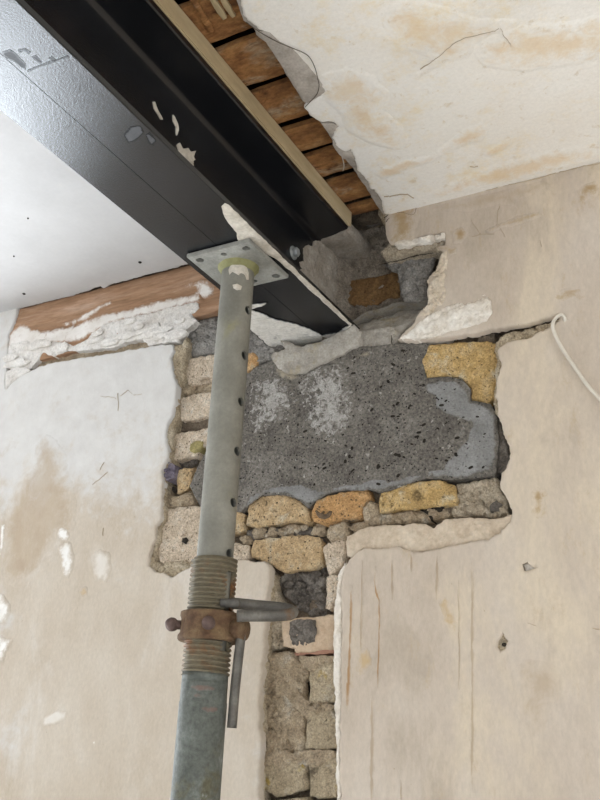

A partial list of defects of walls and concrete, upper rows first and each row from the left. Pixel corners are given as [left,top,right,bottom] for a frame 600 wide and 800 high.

spalling [237,0,325,103]
leakage [2,434,77,588]
spalling [2,302,218,577]
spalling [233,121,559,800]